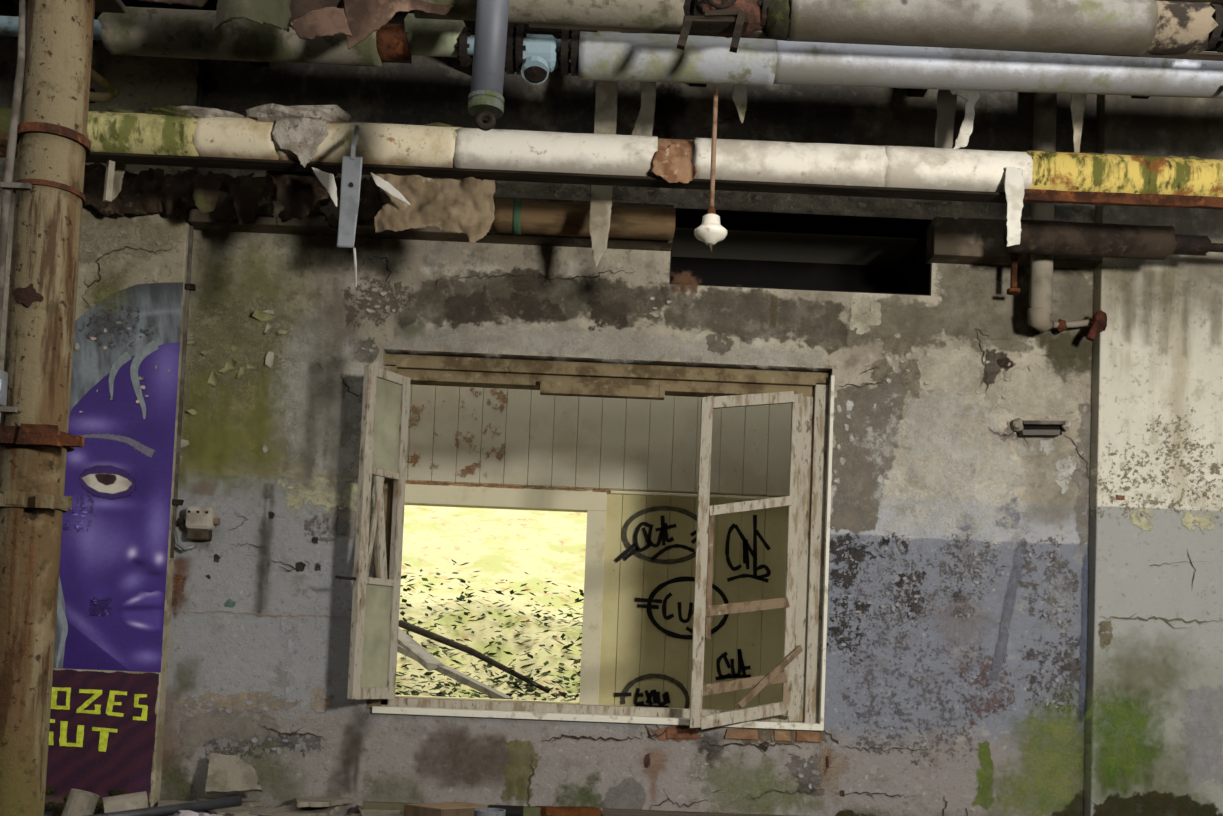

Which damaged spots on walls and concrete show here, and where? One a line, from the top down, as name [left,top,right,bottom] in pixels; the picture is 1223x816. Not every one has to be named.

rust [1023,189,1223,210]
rust [13,284,44,308]
water stain [399,264,1094,381]
water stain [278,331,363,472]
peeling [408,401,444,428]
peeling [454,388,508,478]
peeling [406,451,438,475]
peeling [725,294,1223,796]
crack [1103,613,1223,628]